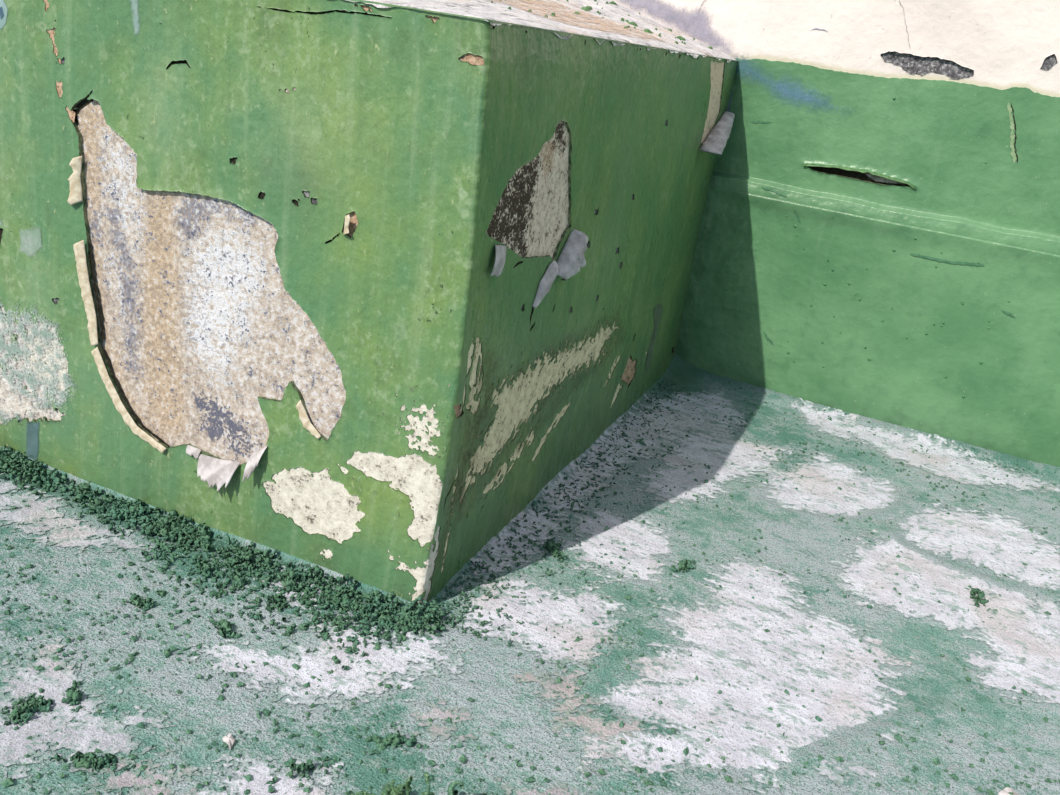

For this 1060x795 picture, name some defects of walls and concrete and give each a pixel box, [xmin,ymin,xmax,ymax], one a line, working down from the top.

peeling [44,0,65,64]
peeling [699,61,735,155]
flaking render [881,51,974,80]
peeling [56,81,346,493]
spalling [327,211,358,243]
peeling [486,121,589,310]
peeling [0,302,77,425]
peeling [0,473,159,565]
peeling [189,319,1060,795]
peeling [0,636,353,795]